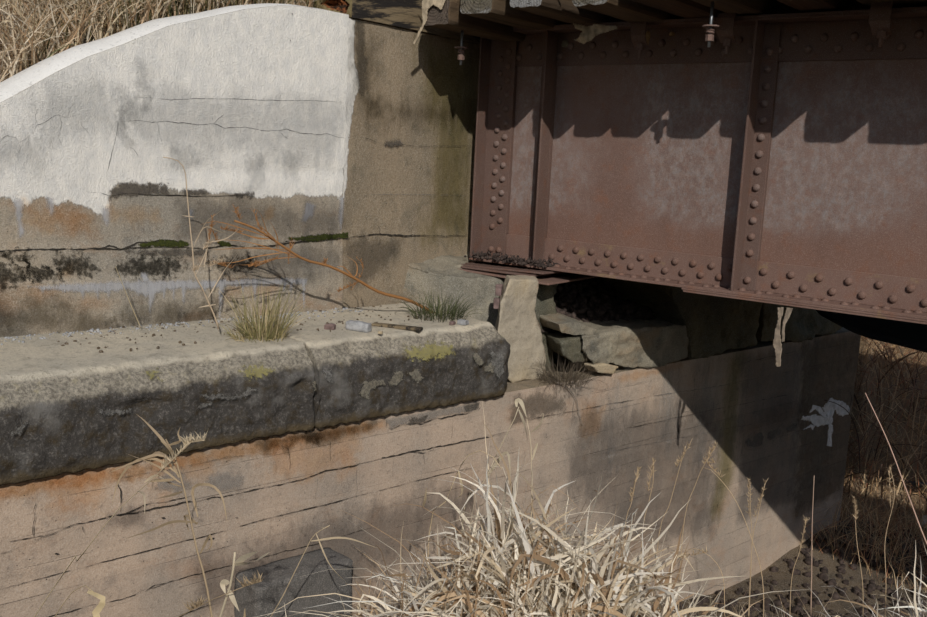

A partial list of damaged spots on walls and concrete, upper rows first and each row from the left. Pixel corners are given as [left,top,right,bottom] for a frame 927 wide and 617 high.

peeling [0,6,360,235]
crack [108,97,469,167]
crack [92,183,235,197]